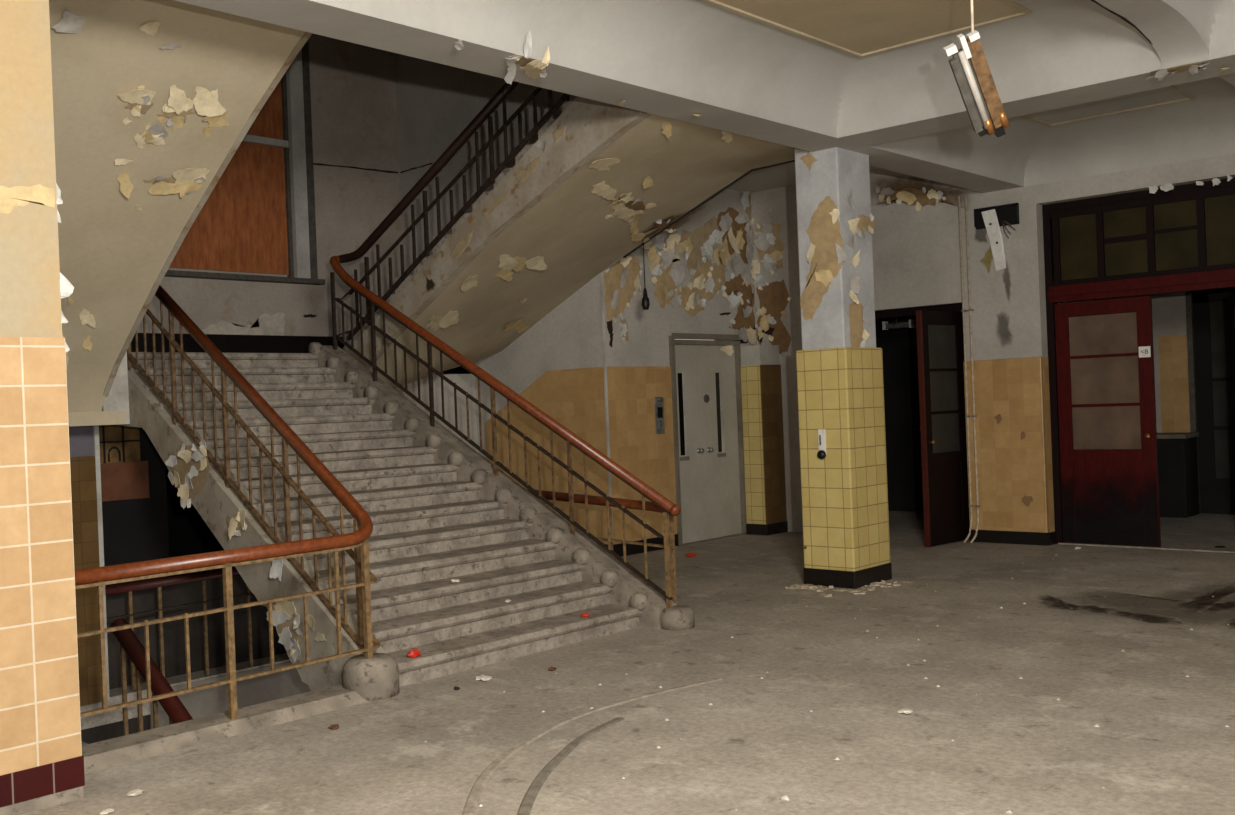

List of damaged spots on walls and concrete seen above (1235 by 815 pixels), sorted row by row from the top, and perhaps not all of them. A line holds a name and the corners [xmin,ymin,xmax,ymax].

peeling [504,30,550,84]
peeling [115,84,230,211]
peeling [0,183,63,223]
peeling [495,254,547,283]
peeling [589,158,876,357]
peeling [165,440,210,509]
spalling [269,559,283,581]
spalling [266,600,327,662]